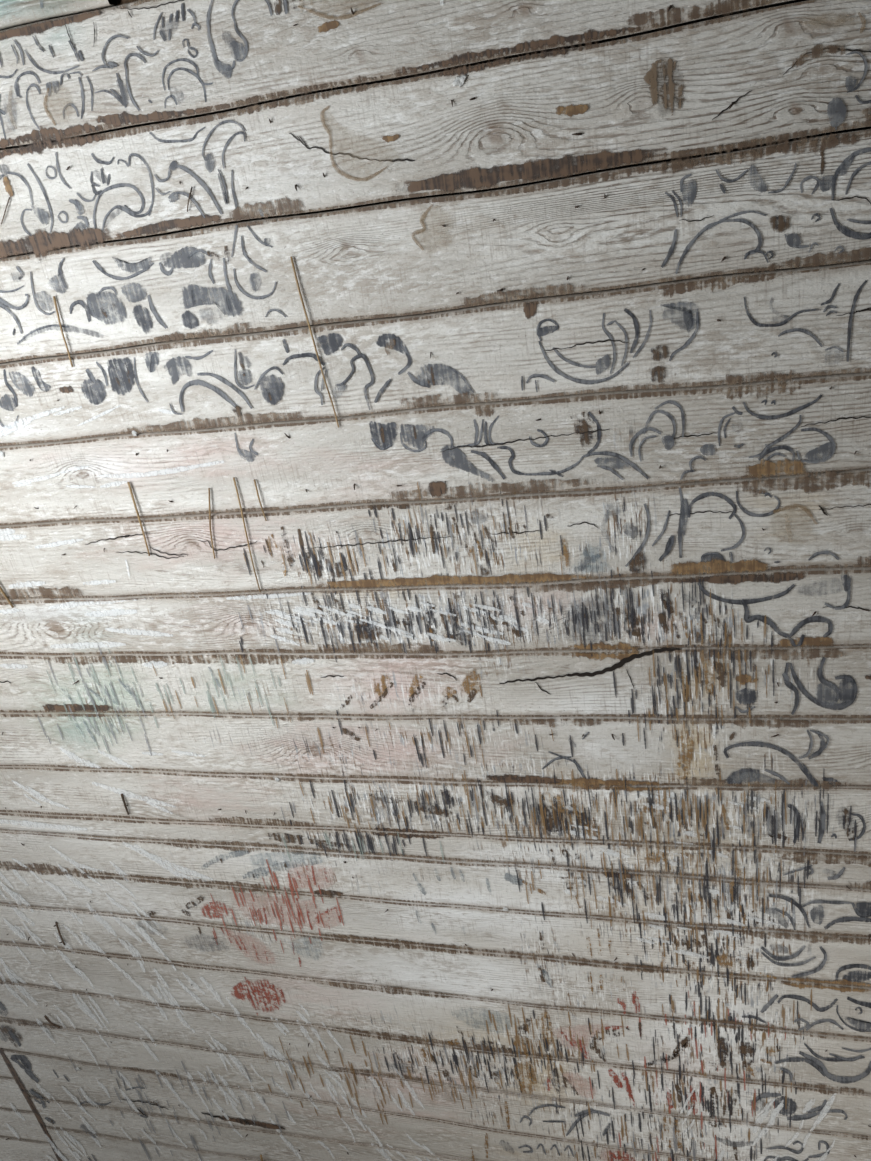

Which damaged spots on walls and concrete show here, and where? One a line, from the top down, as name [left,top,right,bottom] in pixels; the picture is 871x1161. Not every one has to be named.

crack [289,133,415,162]
crack [499,647,680,694]